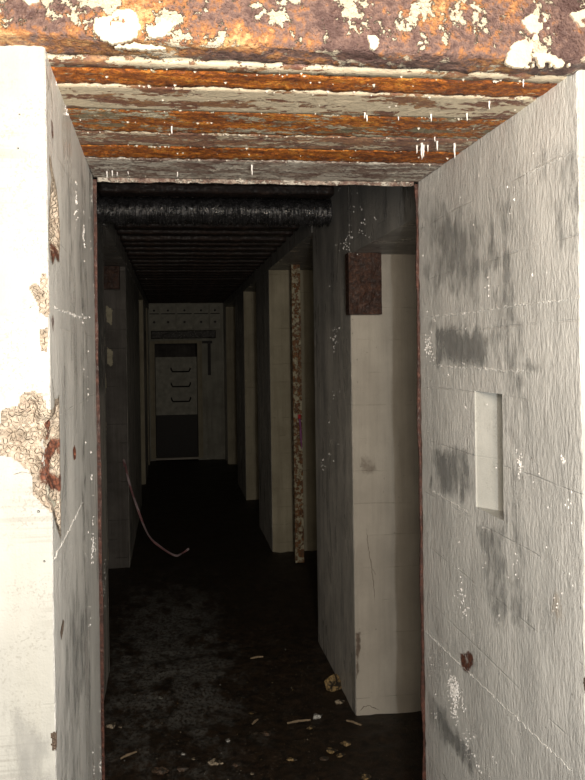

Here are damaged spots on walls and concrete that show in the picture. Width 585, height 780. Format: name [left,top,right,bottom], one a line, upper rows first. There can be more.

peeling [93,9,176,52]
peeling [367,35,379,51]
peeling [504,14,570,69]
peeling [569,9,585,28]
corrosion [51,66,557,98]
corrosion [67,108,506,139]
corrosion [81,144,460,164]
spalling [48,154,60,264]
damp [436,328,485,366]
spalling [0,391,62,538]
damp [431,452,469,501]